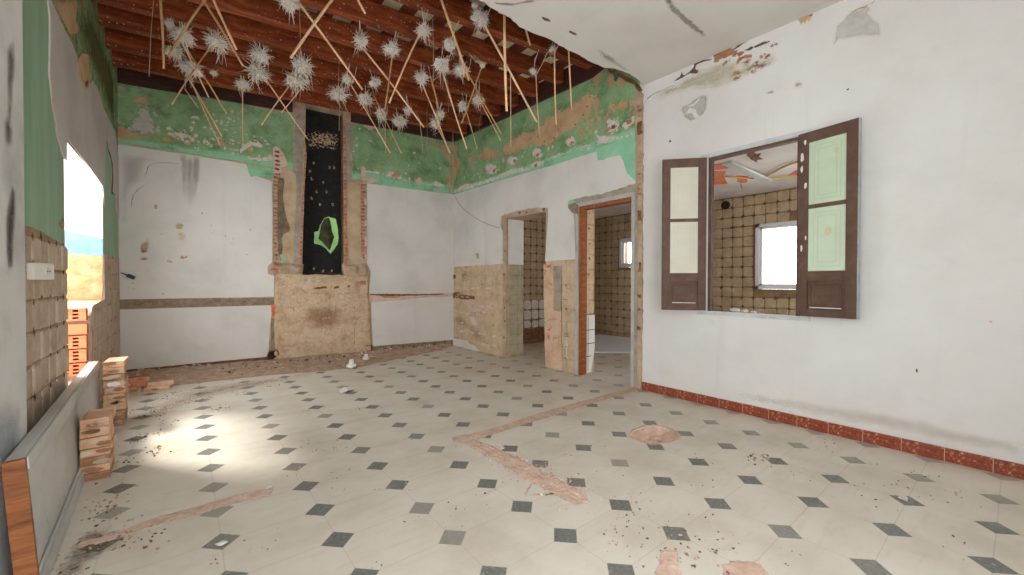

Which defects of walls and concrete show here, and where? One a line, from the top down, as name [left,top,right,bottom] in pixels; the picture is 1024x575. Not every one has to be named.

flaking render [673,41,778,82]
flaking render [106,69,644,389]